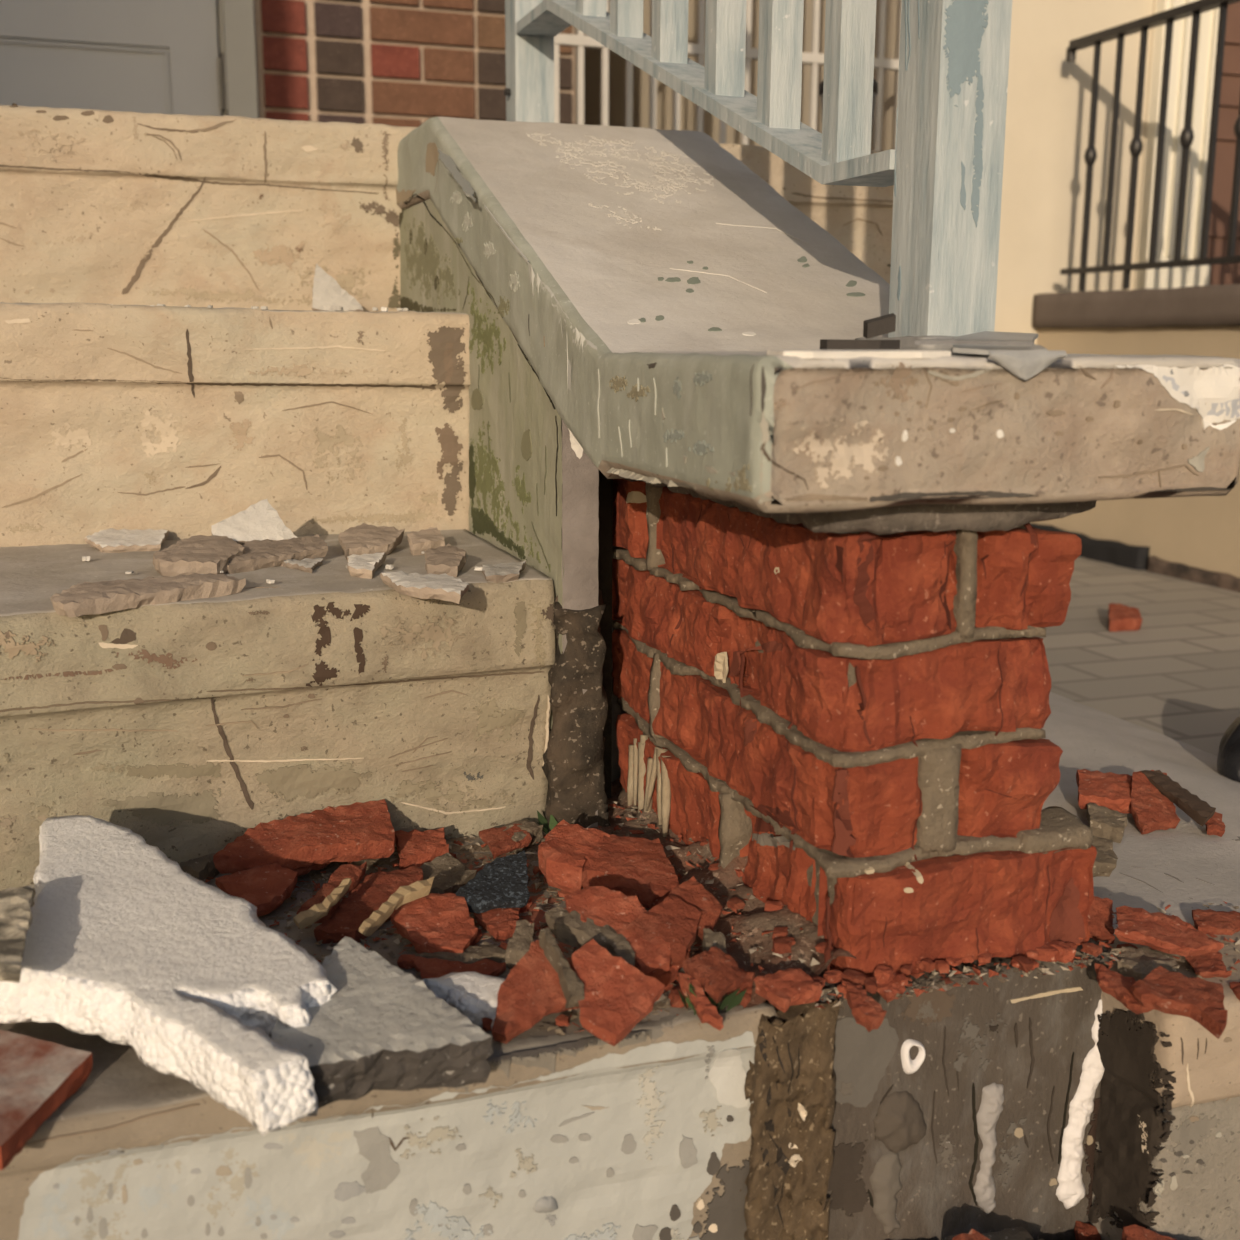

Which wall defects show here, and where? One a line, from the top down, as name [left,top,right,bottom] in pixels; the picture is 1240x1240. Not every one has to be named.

peeling [943,0,989,227]
crack [0,121,597,516]
leakage [420,326,480,413]
peeling [1113,364,1240,430]
leakage [441,461,463,516]
spalling [758,411,1037,504]
peeling [1151,444,1231,492]
flaking render [50,523,466,649]
crack [0,663,550,810]
crack [401,802,506,814]
spalling [749,804,799,836]
spalling [831,767,856,858]